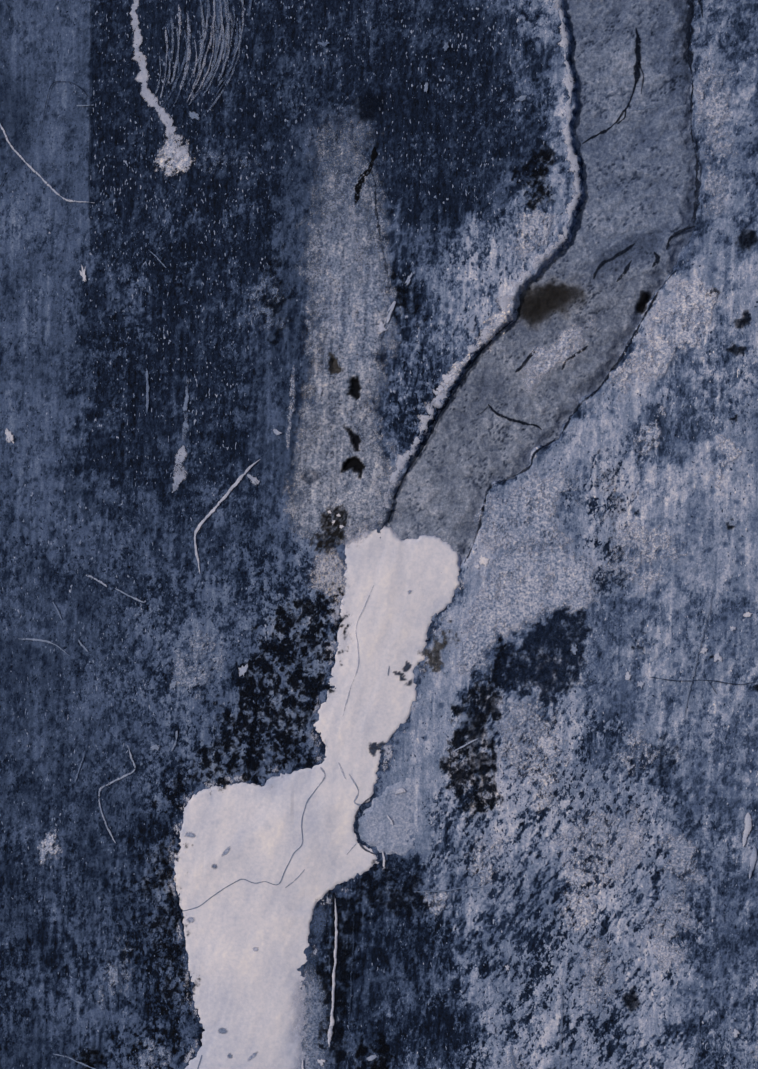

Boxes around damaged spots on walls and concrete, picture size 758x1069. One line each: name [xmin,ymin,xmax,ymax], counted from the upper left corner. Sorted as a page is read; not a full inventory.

crack [464,0,703,563]
spalling [328,352,361,400]
spalling [340,427,366,479]
crack [388,321,512,523]
flaking render [382,0,735,811]
peeling [174,631,222,698]
peeling [369,742,385,756]
peeling [423,892,449,915]
peeling [306,906,327,980]